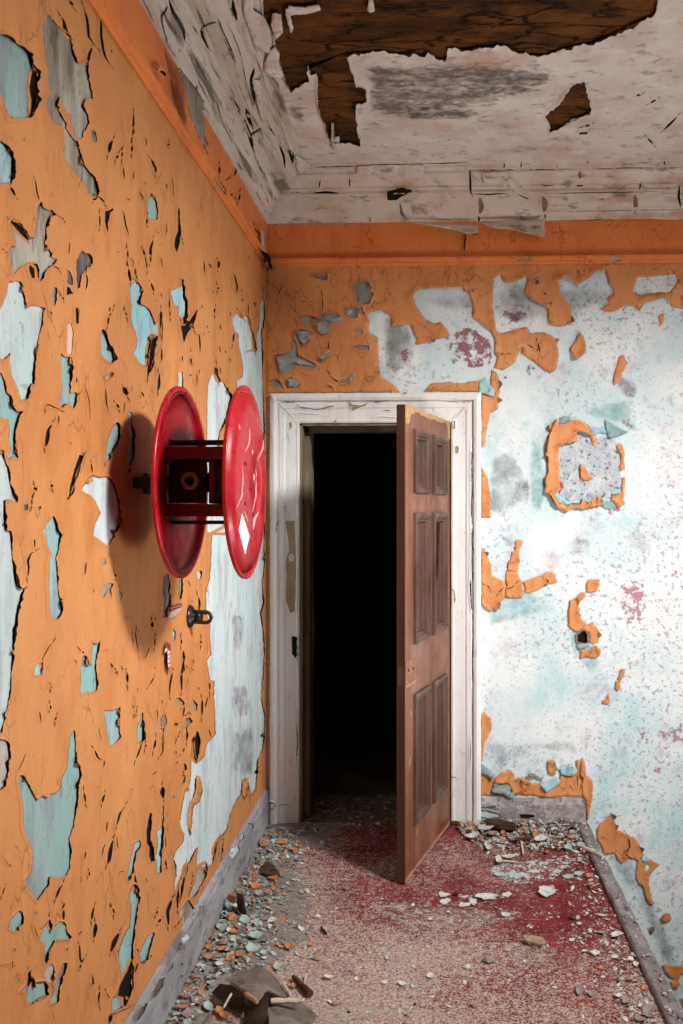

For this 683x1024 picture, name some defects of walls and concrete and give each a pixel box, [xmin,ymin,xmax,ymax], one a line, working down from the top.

peeling [0,13,100,203]
flaking render [252,0,661,174]
damp [372,67,547,119]
peeling [126,276,188,373]
peeling [204,229,683,464]
peeling [0,198,94,904]
peeling [71,327,136,566]
peeling [481,539,557,612]
peeling [568,579,602,659]
peeling [545,416,627,512]
peeling [101,477,299,1021]
peeling [481,711,660,905]